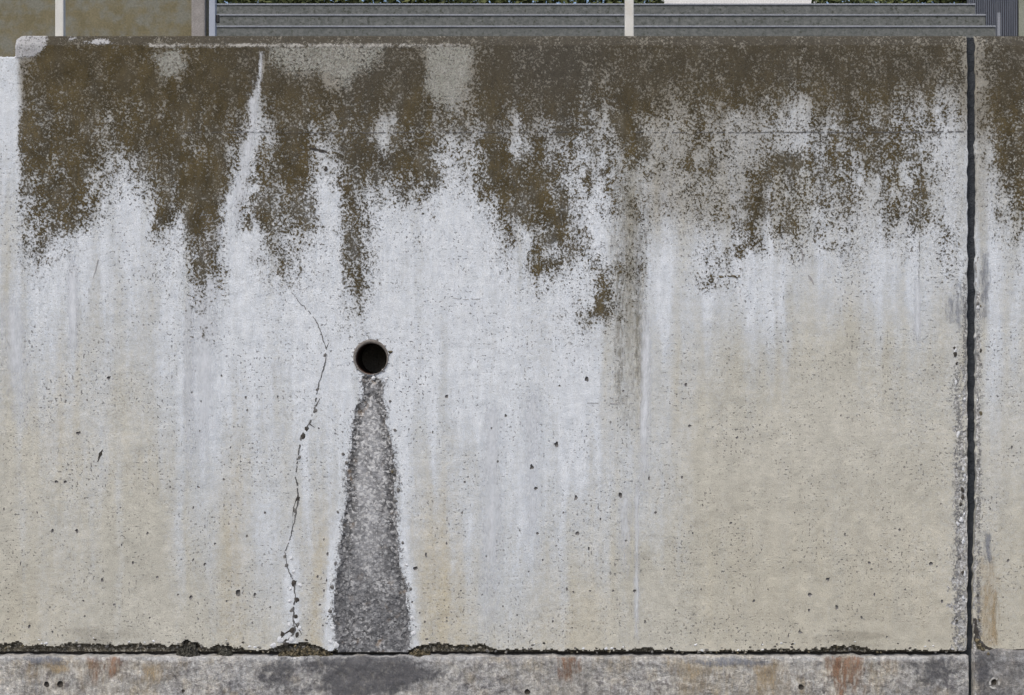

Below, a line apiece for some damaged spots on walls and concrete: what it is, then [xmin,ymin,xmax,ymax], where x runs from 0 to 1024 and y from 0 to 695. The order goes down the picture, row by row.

water stain [17,199,106,347]
water stain [145,51,324,438]
water stain [338,197,375,338]
water stain [483,180,650,346]
water stain [703,230,737,297]
water stain [751,211,819,266]
water stain [991,186,1024,266]
crack [0,293,1024,657]